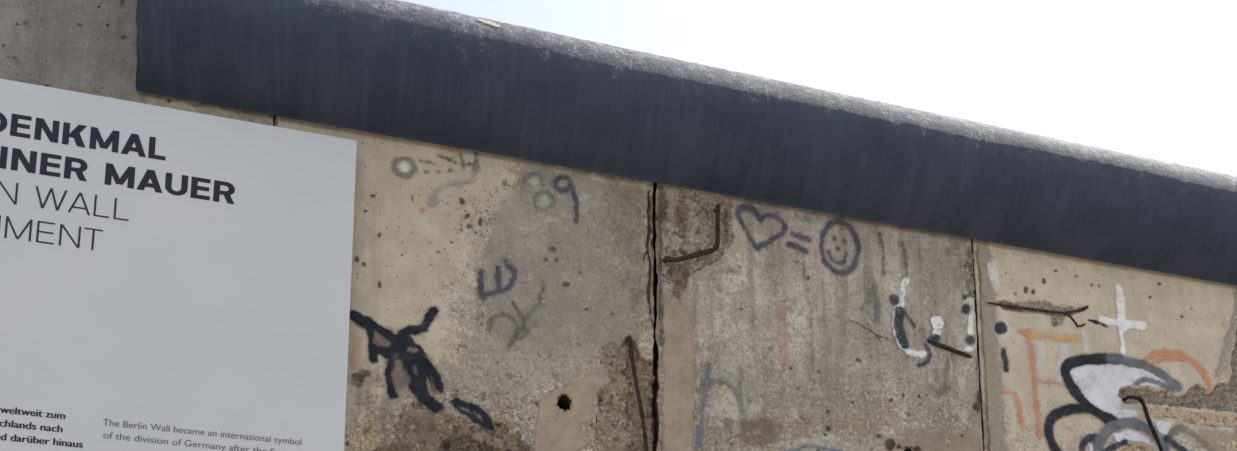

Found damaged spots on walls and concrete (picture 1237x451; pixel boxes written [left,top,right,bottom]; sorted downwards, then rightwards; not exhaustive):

spalling [591,335,654,451]
spalling [1118,288,1237,451]